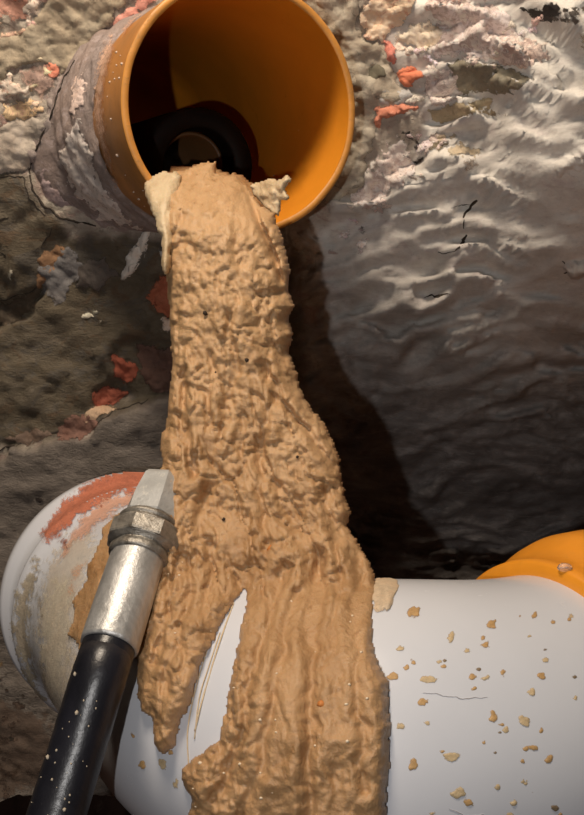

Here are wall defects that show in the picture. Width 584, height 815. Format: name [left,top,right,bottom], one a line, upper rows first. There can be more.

peeling [0,0,47,40]
flaking render [36,57,60,78]
peeling [359,0,551,128]
peeling [0,72,44,121]
peeling [339,133,480,253]
crack [438,200,477,254]
spalling [0,245,119,326]
flaking render [145,276,170,318]
flaking render [92,343,173,406]
spalling [5,414,98,446]
crack [97,399,148,424]